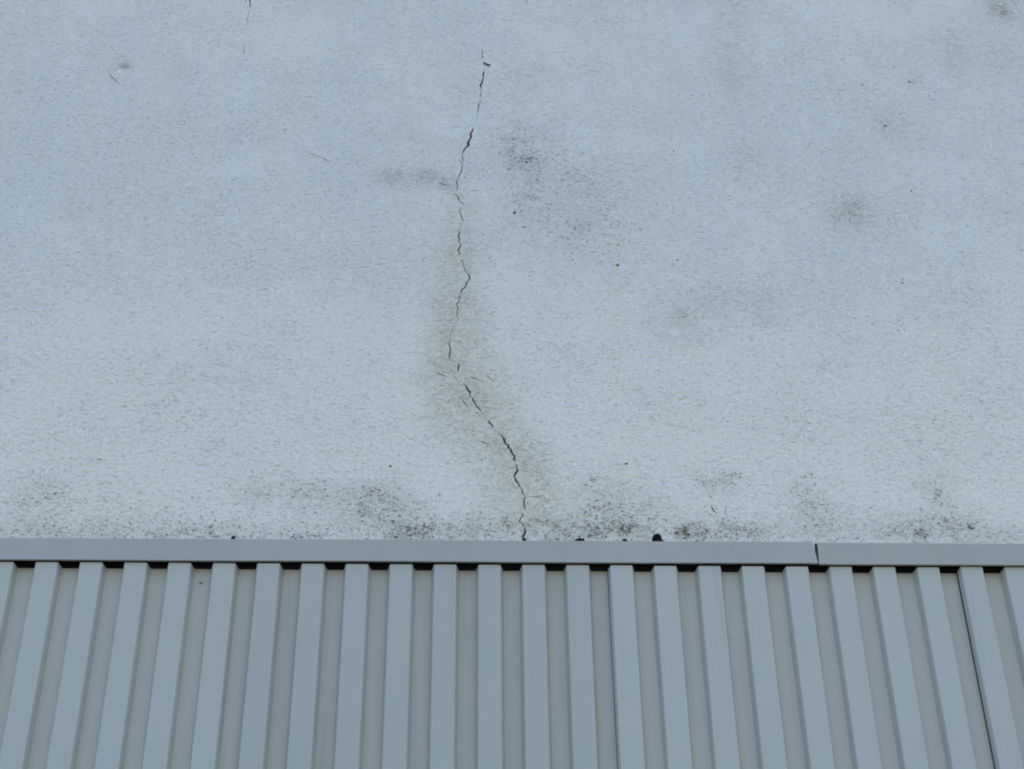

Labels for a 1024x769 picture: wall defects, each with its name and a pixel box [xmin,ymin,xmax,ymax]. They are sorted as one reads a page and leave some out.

crack [437,52,541,538]
damp [123,458,768,542]
mould [891,486,979,543]